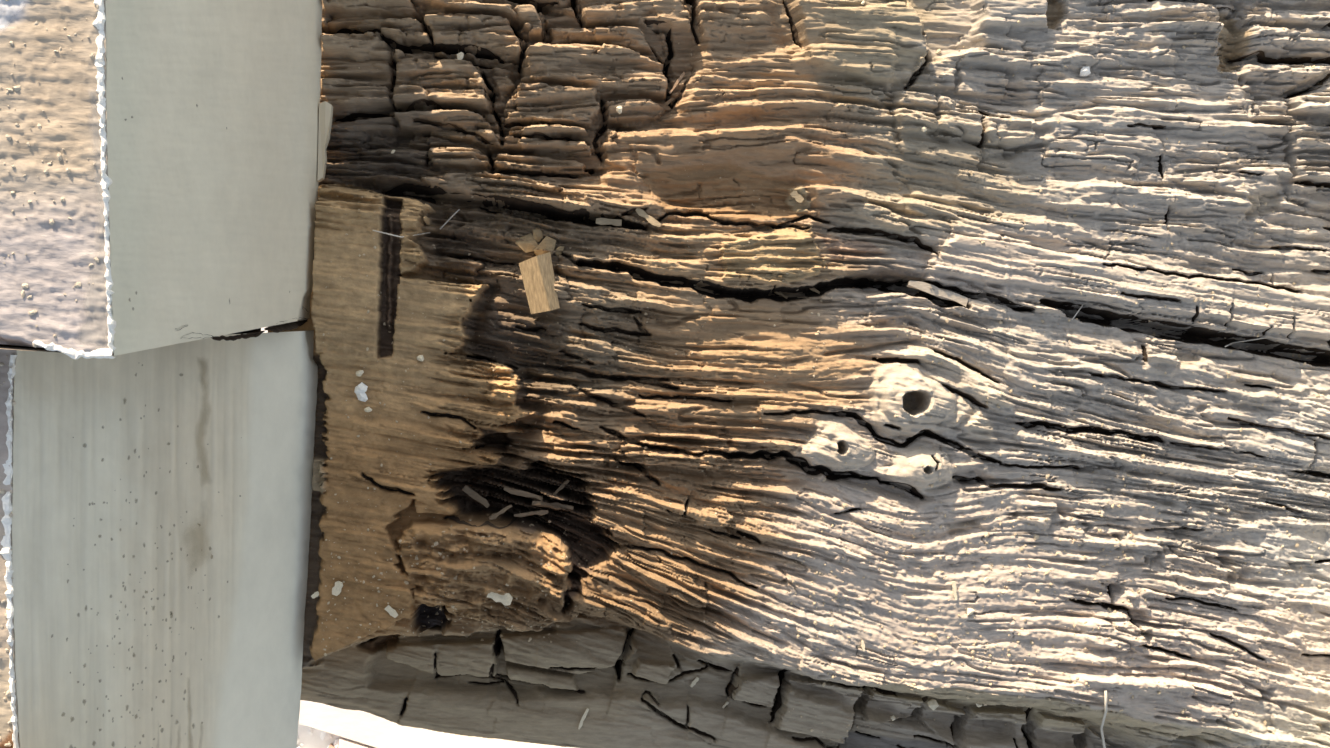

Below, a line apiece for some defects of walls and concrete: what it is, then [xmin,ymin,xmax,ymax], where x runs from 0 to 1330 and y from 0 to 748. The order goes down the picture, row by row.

crack [335,0,608,179]
crack [644,0,699,109]
crack [904,56,927,89]
crack [667,212,939,256]
crack [450,252,579,266]
crack [451,353,517,369]
crack [516,303,1330,543]
crack [611,540,757,589]
crack [434,628,956,748]
crack [1004,705,1033,748]